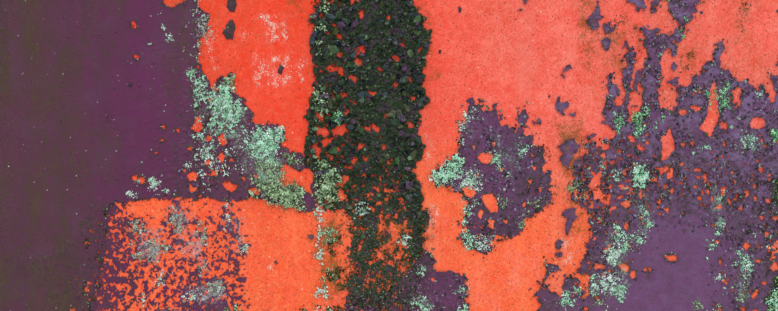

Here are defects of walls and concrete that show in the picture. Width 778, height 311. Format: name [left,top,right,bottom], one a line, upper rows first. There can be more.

peeling [0,0,430,311]
peeling [432,97,557,260]
peeling [529,0,778,311]